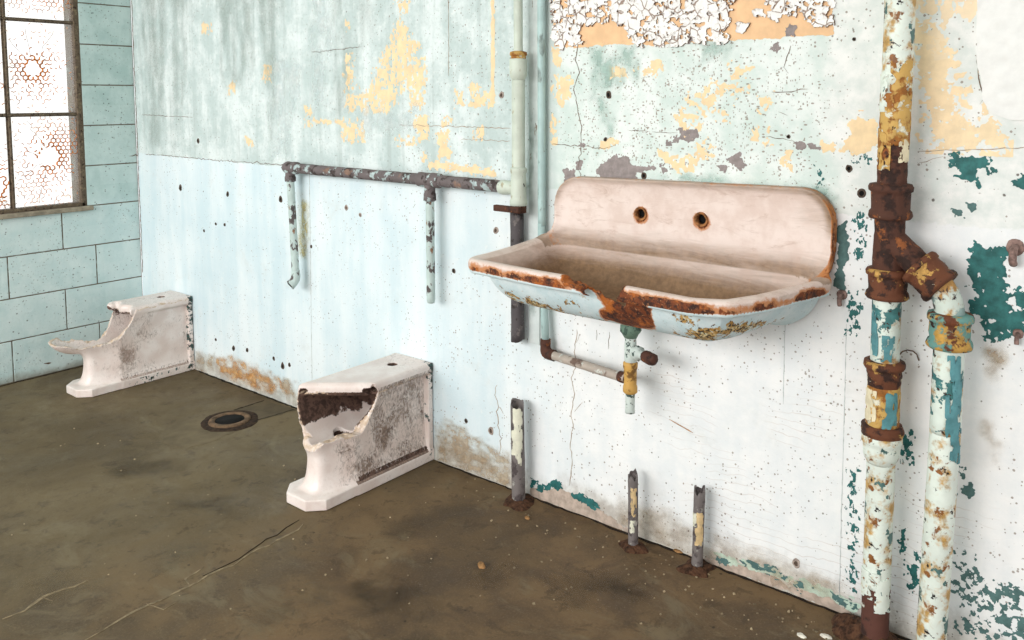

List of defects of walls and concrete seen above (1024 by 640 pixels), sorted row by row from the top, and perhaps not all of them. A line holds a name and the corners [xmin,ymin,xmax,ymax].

crack [556,46,674,176]
peeling [549,0,837,146]
peeling [596,0,1014,189]
peeling [964,240,1024,343]
crack [0,362,82,387]
crack [85,520,303,640]
crack [197,370,297,420]
damp [439,425,509,485]
spalling [530,477,637,533]
crack [437,330,839,614]
spalling [673,469,921,614]
peeling [950,550,1024,640]